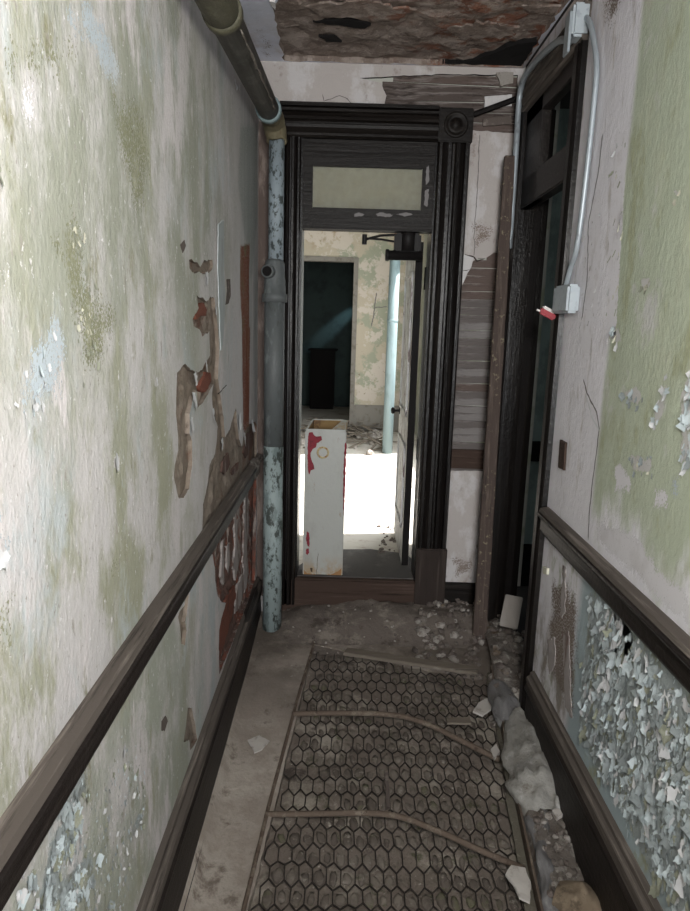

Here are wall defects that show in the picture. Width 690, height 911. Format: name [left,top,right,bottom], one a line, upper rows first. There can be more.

flaking render [272,0,569,67]
flaking render [603,0,620,28]
flaking render [180,240,213,284]
flaking render [174,279,257,530]
crack [583,379,600,538]
peeling [649,374,670,430]
peeling [676,370,690,476]
flaking render [212,478,257,674]
peeling [543,565,690,911]
peeling [16,727,147,911]